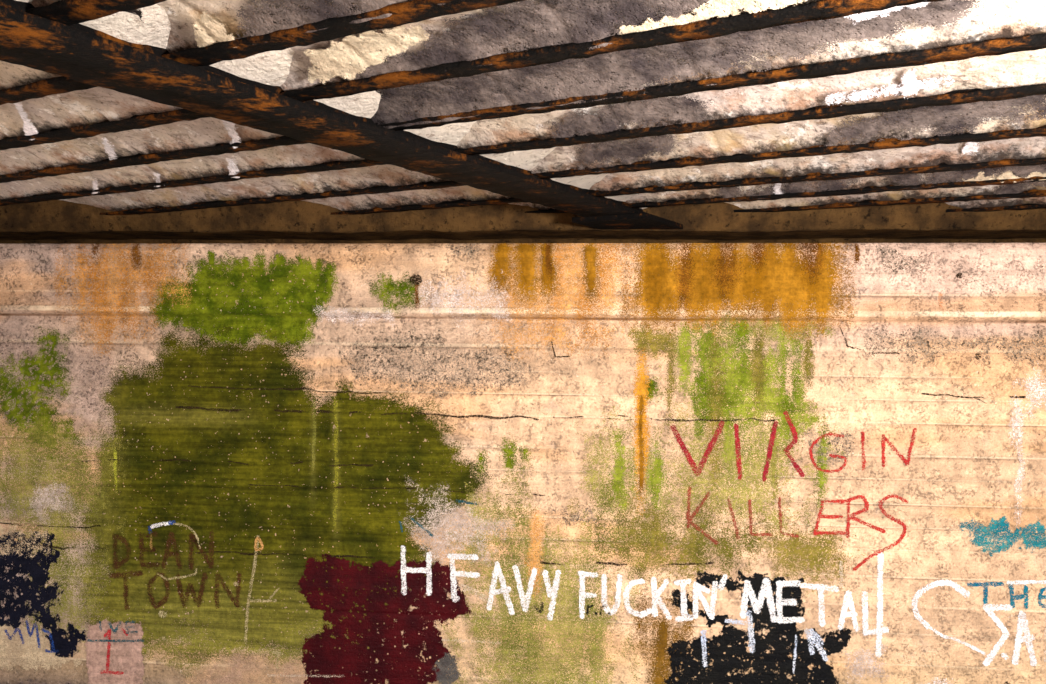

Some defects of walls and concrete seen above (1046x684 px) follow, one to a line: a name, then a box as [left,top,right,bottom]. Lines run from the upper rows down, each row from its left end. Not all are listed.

corrosion [52,243,192,359]
water stain [206,250,217,275]
water stain [272,252,395,339]
corrosion [469,243,860,516]
water stain [663,318,831,514]
water stain [180,651,319,684]